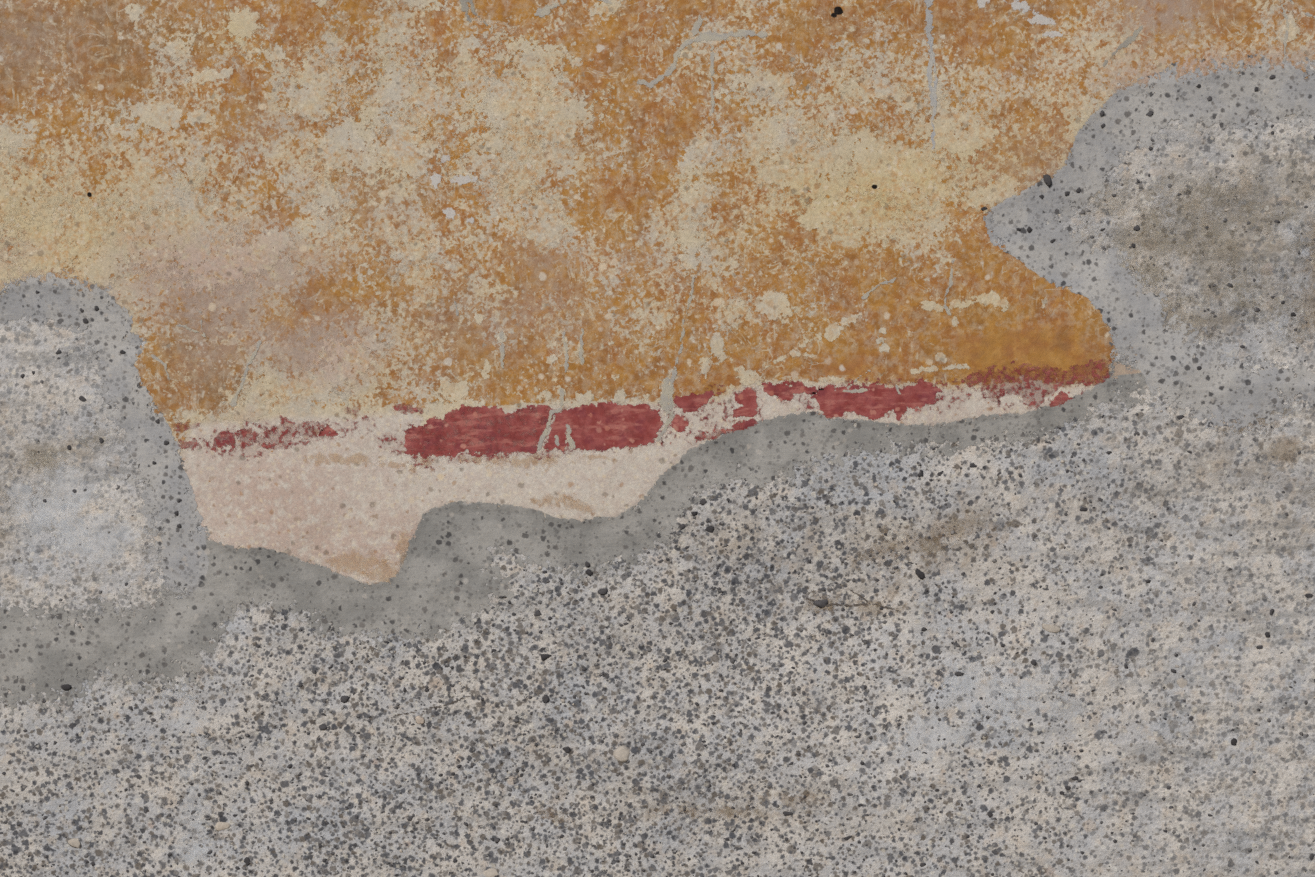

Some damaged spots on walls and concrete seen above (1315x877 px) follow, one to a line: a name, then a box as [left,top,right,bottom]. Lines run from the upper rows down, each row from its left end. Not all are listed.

spalling [0,3,622,635]
peeling [392,0,448,12]
peeling [668,67,1027,281]
crack [924,0,938,150]
spalling [1016,106,1315,386]
spalling [0,276,1315,877]